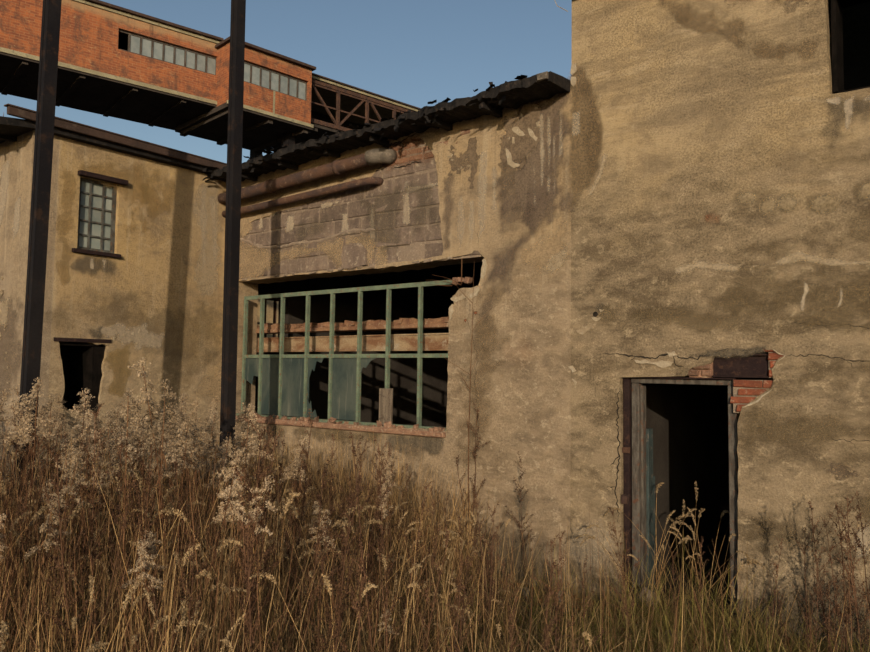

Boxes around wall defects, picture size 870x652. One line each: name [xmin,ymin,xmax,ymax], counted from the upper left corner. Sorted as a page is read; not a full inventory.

damp [661,0,744,46]
peeling [499,103,545,195]
damp [488,69,606,280]
spalling [239,129,487,320]
spalling [688,362,715,378]
crack [603,347,865,368]
spalling [730,349,785,413]